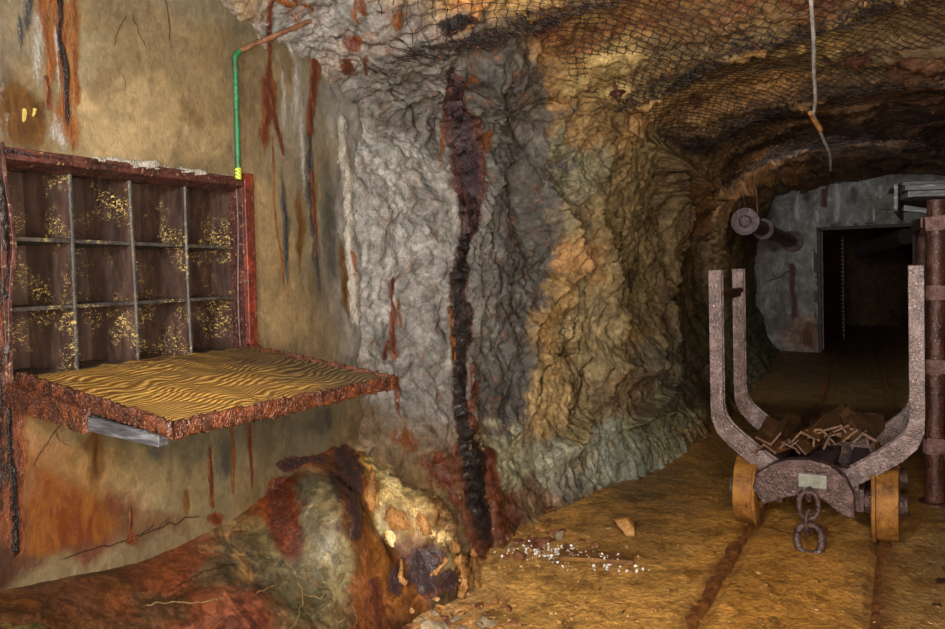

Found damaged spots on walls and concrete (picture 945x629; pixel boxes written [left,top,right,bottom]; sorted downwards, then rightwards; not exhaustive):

rust [5,0,134,169]
rust [259,0,314,285]
rust [0,170,28,558]
rust [207,448,224,526]
rust [255,58,509,629]